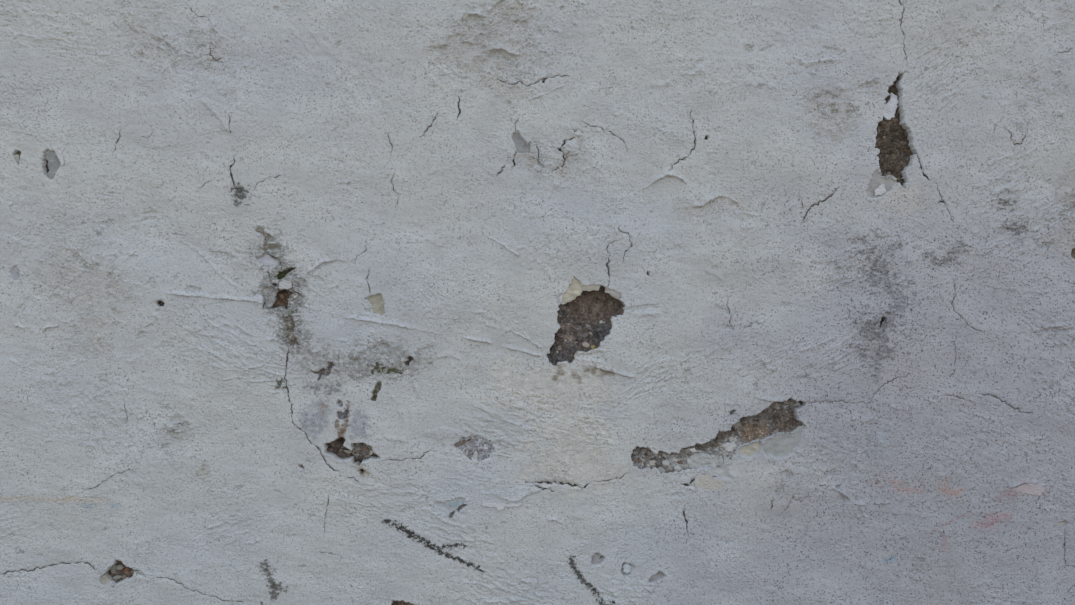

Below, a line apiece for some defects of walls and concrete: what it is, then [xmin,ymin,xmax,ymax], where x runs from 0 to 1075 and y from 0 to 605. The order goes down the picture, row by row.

spalling [866,75,913,197]
crack [914,153,954,221]
spalling [547,278,624,365]
spalling [327,437,379,462]
spalling [631,399,804,491]
spalling [100,560,145,585]